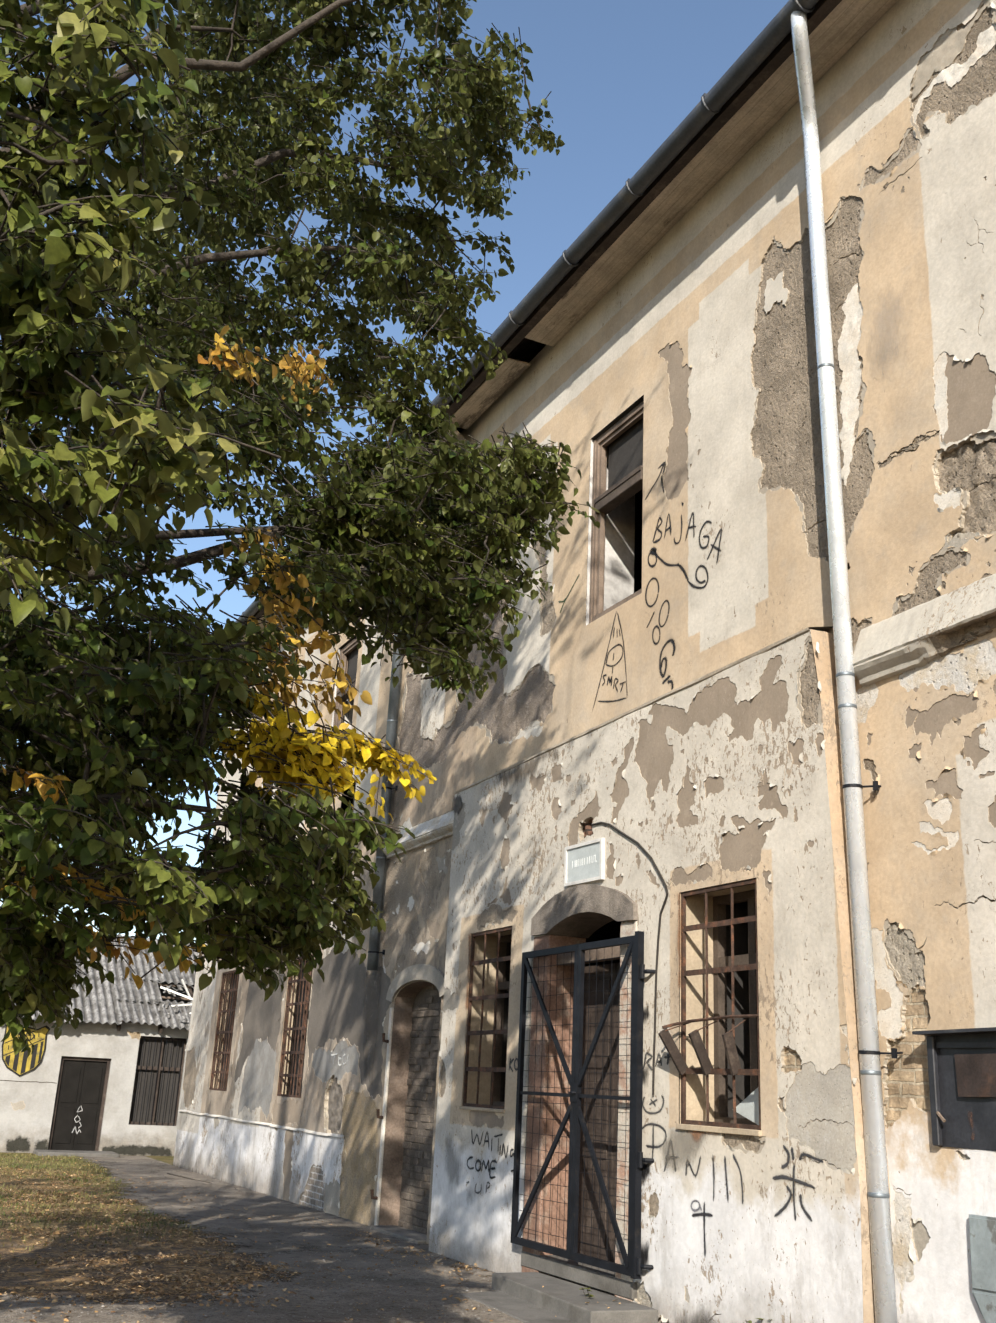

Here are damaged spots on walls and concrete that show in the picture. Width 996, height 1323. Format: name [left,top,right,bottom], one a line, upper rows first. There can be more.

peeling [658,341,701,500]
spalling [750,228,829,562]
spalling [825,0,996,617]
spalling [396,599,556,780]
peeling [856,683,880,798]
peeling [898,620,996,856]
peeling [230,636,826,1225]
crack [918,895,996,949]
peeling [777,1024,857,1175]
flaking render [872,919,931,1130]
peeling [892,1188,931,1323]